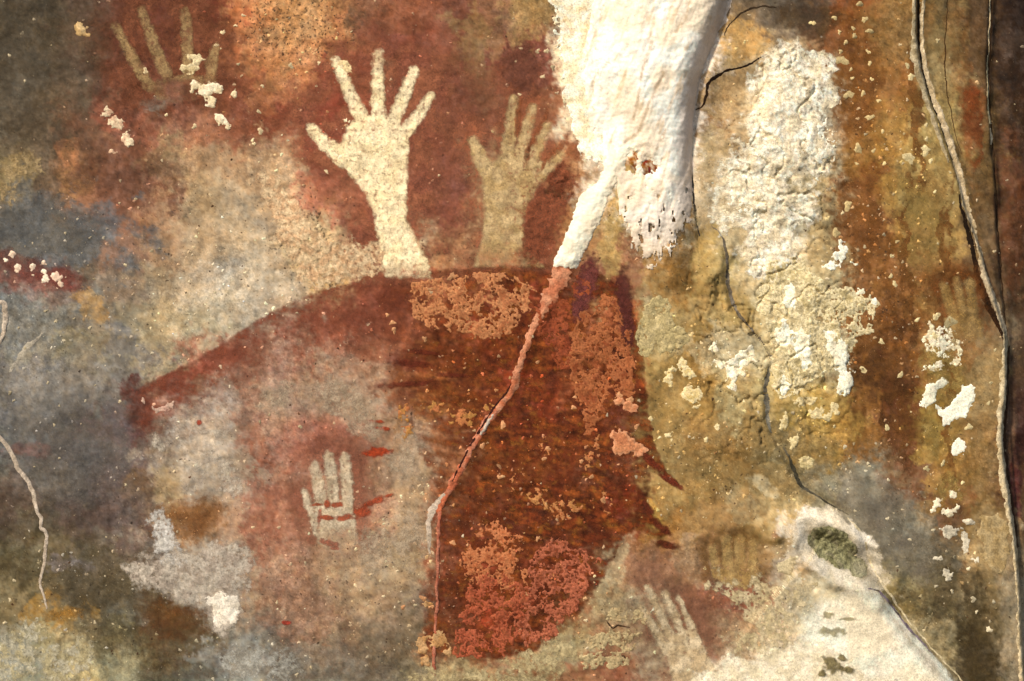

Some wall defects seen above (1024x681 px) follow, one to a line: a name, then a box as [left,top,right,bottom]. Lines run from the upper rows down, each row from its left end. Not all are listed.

crack [425,264,572,676]
peeling [405,520,616,667]
peeling [385,49,1012,594]
crack [695,51,773,110]
crack [724,5,777,36]
leakage [696,3,839,378]
crack [692,175,963,681]
leakage [919,332,964,404]
crack [910,0,1024,681]